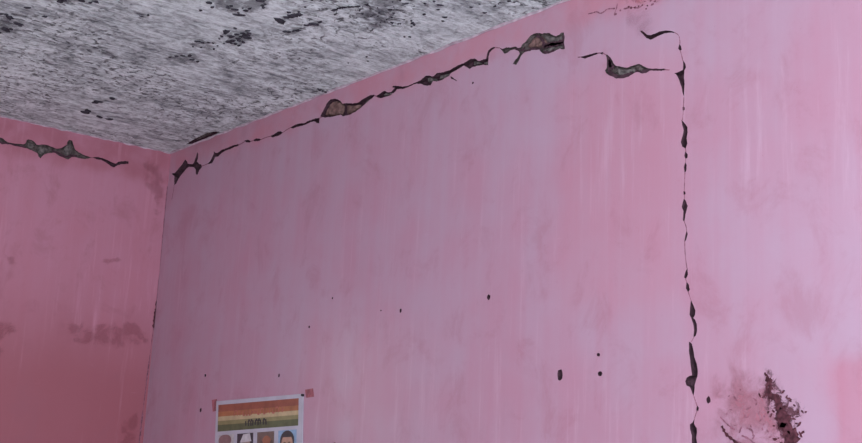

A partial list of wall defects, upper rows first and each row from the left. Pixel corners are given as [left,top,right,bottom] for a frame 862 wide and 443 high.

flaking render [500,33,565,65]
flaking render [578,52,670,79]
crack [0,138,128,167]
crack [139,47,500,443]
crack [640,31,699,443]
crack [720,417,755,443]